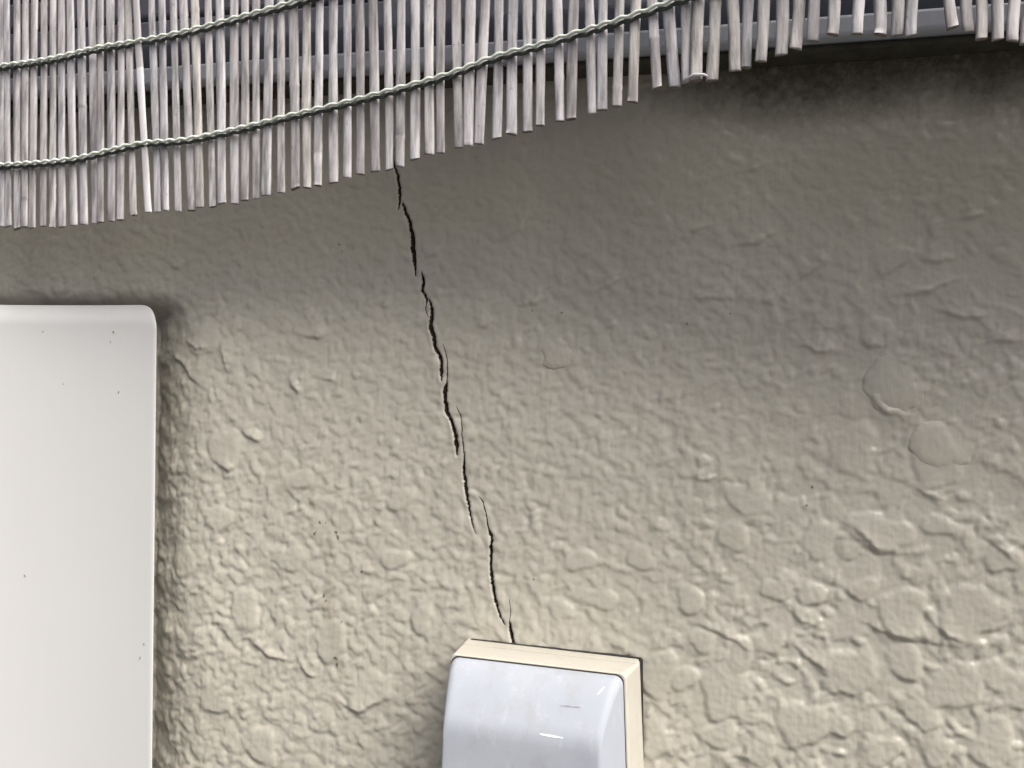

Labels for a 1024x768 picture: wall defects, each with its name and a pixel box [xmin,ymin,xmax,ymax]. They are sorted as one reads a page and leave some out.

crack [393,146,515,643]